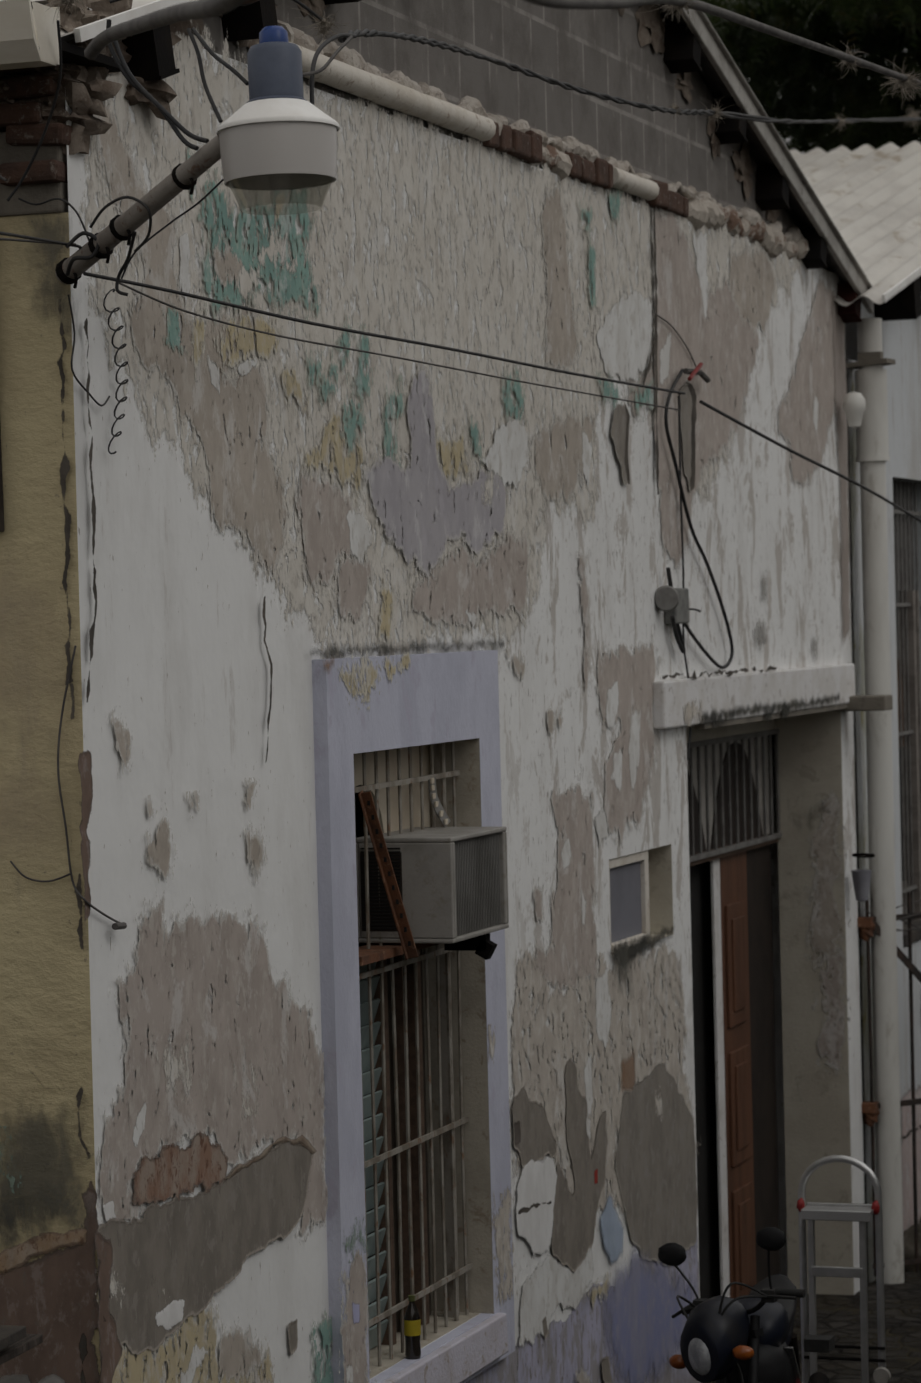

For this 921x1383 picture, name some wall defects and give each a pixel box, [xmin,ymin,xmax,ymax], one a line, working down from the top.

peeling [91,98,148,214]
flaking render [476,122,543,164]
peeling [124,152,778,710]
peeling [777,272,837,490]
peeling [244,777,268,883]
peeling [488,547,704,1383]
peeling [0,790,328,1383]
water stain [0,1116,80,1229]
peeling [288,1217,377,1383]